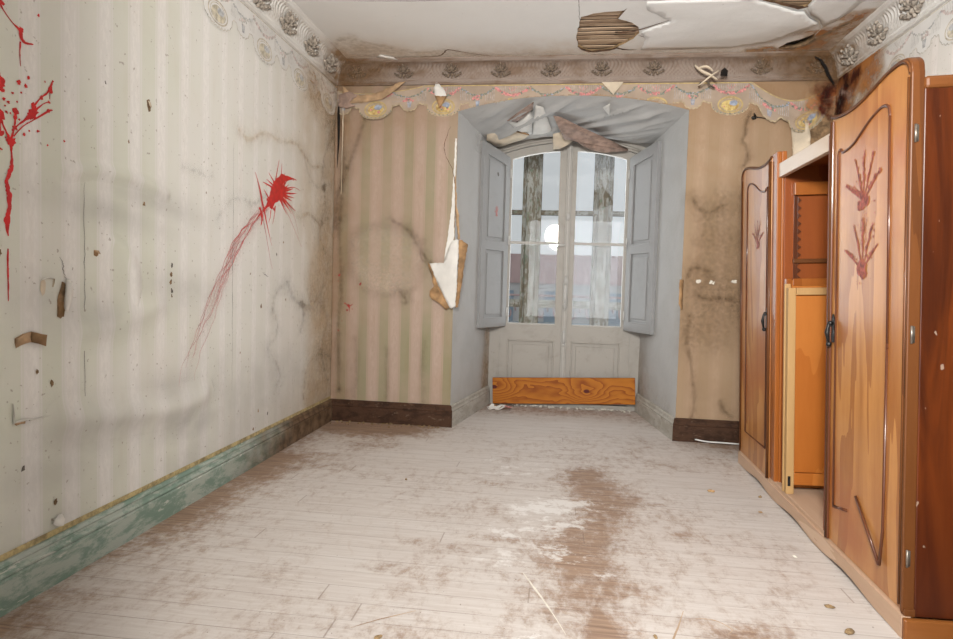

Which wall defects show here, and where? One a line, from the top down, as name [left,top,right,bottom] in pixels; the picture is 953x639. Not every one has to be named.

flaking render [576,0,864,52]
crack [804,9,835,85]
peeling [40,277,74,319]